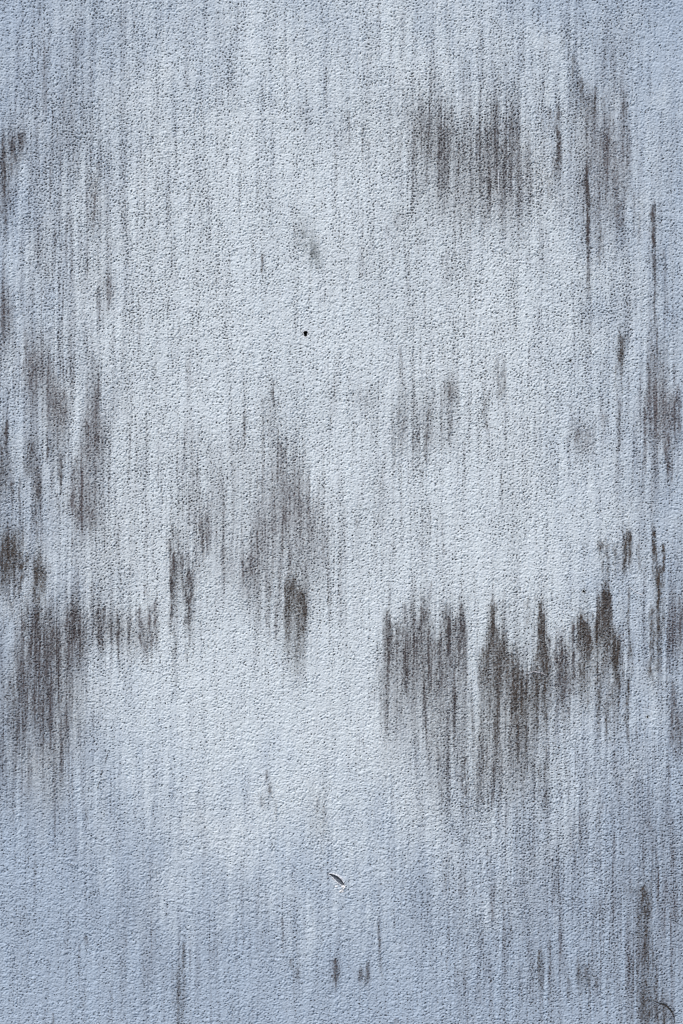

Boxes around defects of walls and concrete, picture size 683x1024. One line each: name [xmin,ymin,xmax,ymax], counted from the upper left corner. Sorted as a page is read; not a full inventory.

leakage [419,108,459,188]
leakage [476,126,528,201]
leakage [585,98,628,262]
leakage [644,346,681,447]
leakage [0,530,46,596]
leakage [170,530,194,625]
leakage [246,450,315,572]
leakage [284,579,307,645]
leakage [649,531,682,673]
leakage [3,601,156,764]
leakage [383,602,467,754]
leakage [480,583,632,774]